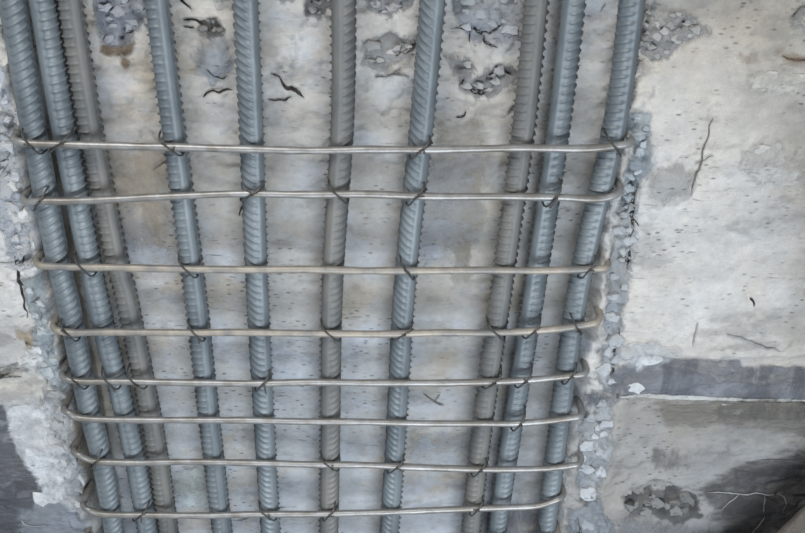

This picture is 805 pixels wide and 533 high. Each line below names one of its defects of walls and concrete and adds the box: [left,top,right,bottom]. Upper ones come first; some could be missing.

spalling [93,0,146,46]
spalling [304,0,331,19]
spalling [453,0,524,46]
spalling [361,32,412,74]
crack [203,71,233,97]
crack [269,74,303,101]
spalling [450,58,517,98]
crack [691,119,713,194]
flaking render [0,65,93,520]
spalling [567,112,759,533]
water stain [610,359,805,437]
water stain [700,452,805,533]